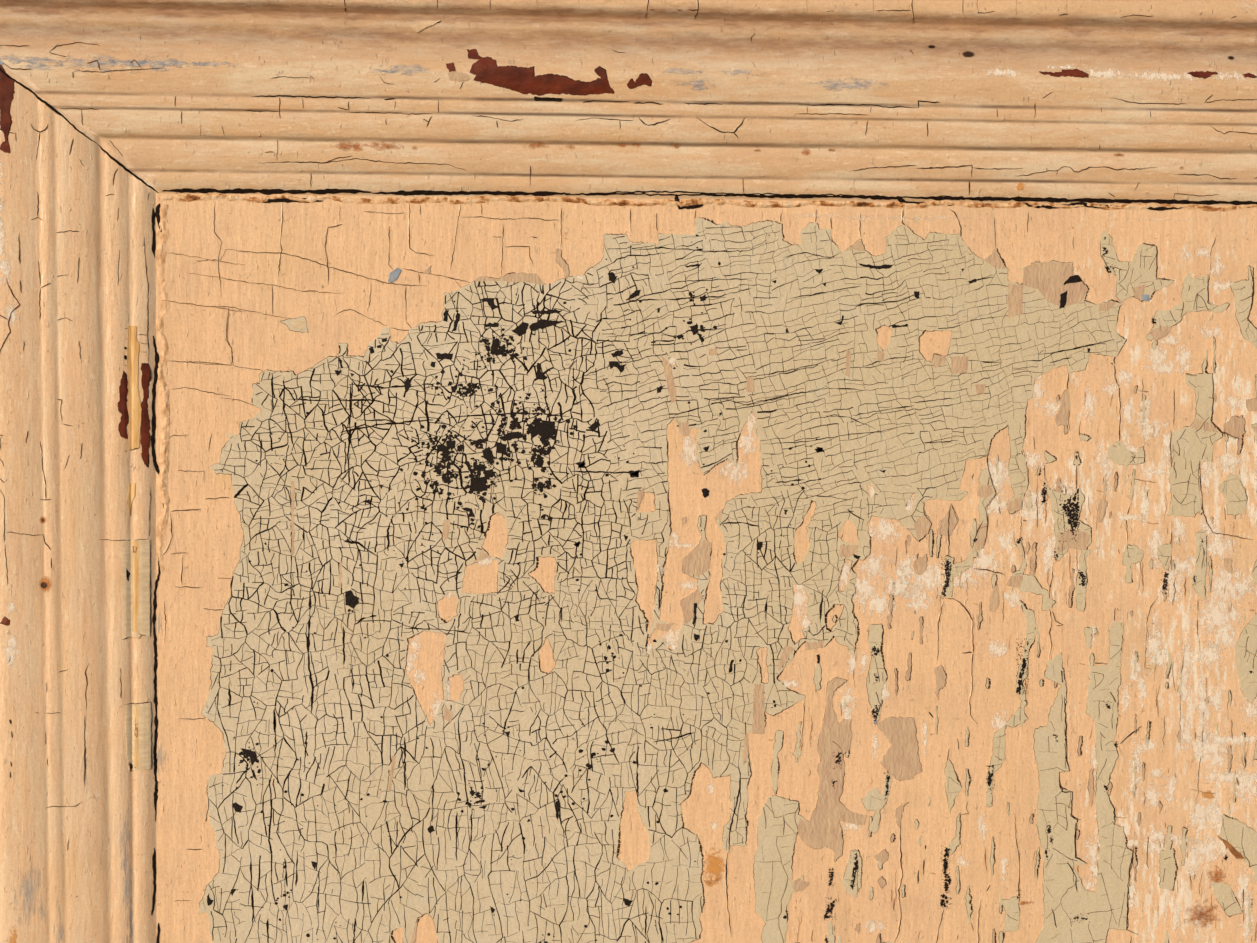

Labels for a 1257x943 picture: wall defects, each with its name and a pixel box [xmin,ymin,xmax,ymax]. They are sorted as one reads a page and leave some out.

peeling [0,57,227,177]
peeling [446,49,652,102]
peeling [1039,65,1257,81]
crack [273,492,314,771]
crack [396,513,562,861]
peeling [545,738,615,820]
crack [0,64,1257,487]
peeling [117,193,1257,638]
crack [645,751,752,943]
crack [571,339,949,652]
crack [756,236,1149,777]
peeling [743,229,1257,943]